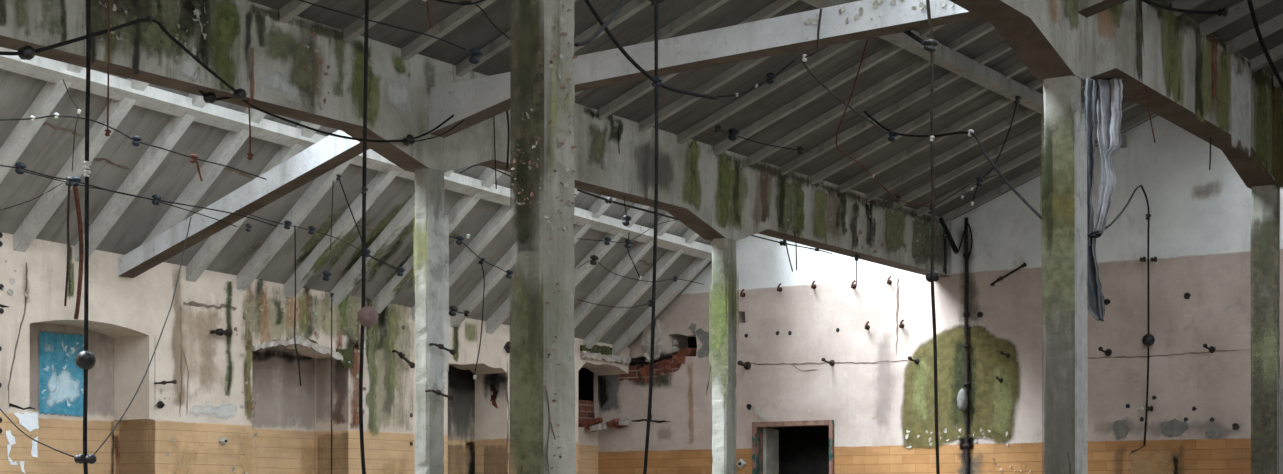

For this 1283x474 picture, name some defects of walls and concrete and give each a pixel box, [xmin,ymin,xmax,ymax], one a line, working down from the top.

damp [91,0,363,106]
damp [1136,0,1226,117]
damp [369,75,379,125]
damp [584,108,623,167]
damp [1252,71,1283,189]
damp [720,154,740,225]
damp [760,174,876,249]
damp [1040,138,1053,240]
peeling [38,342,84,407]
damp [227,279,410,434]
spalling [619,340,697,384]
damp [913,359,928,420]